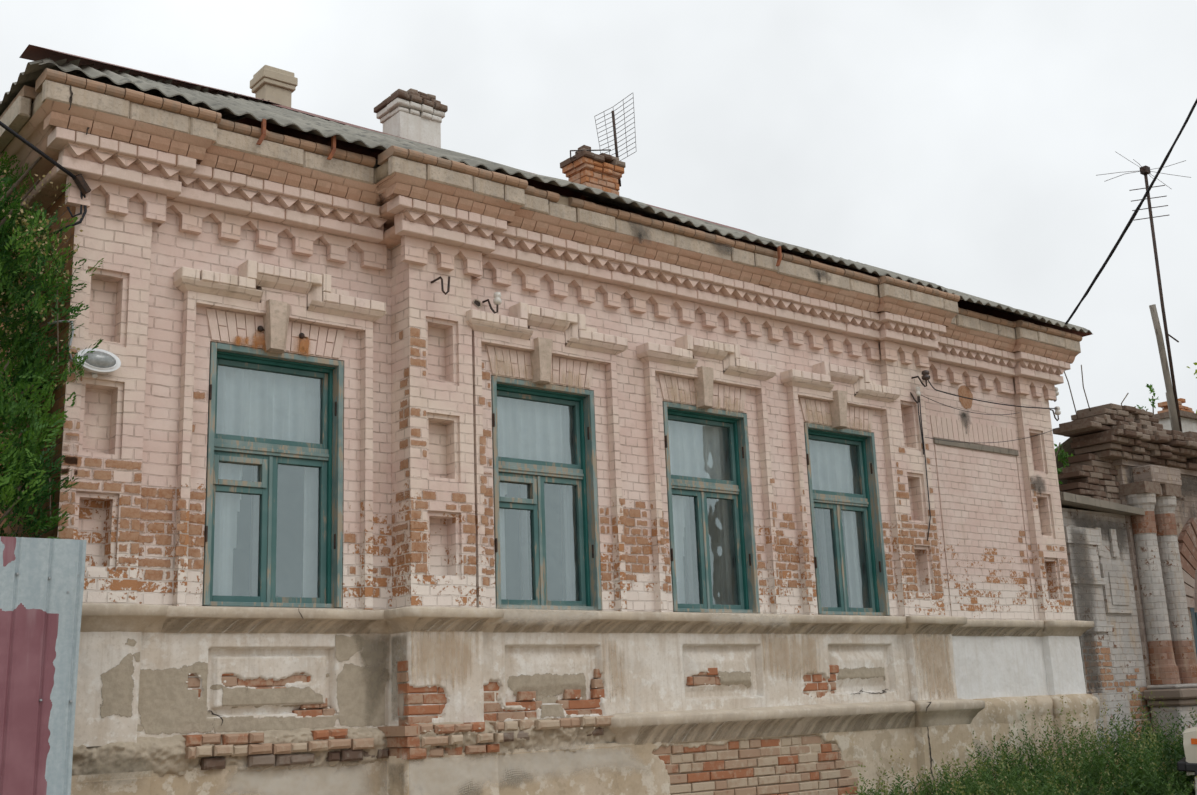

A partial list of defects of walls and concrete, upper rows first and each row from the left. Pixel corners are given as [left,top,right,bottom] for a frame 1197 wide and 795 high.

peeling [58,420,206,581]
peeling [600,490,672,593]
peeling [100,635,450,738]
peeling [468,669,606,736]
flaking render [652,734,863,795]